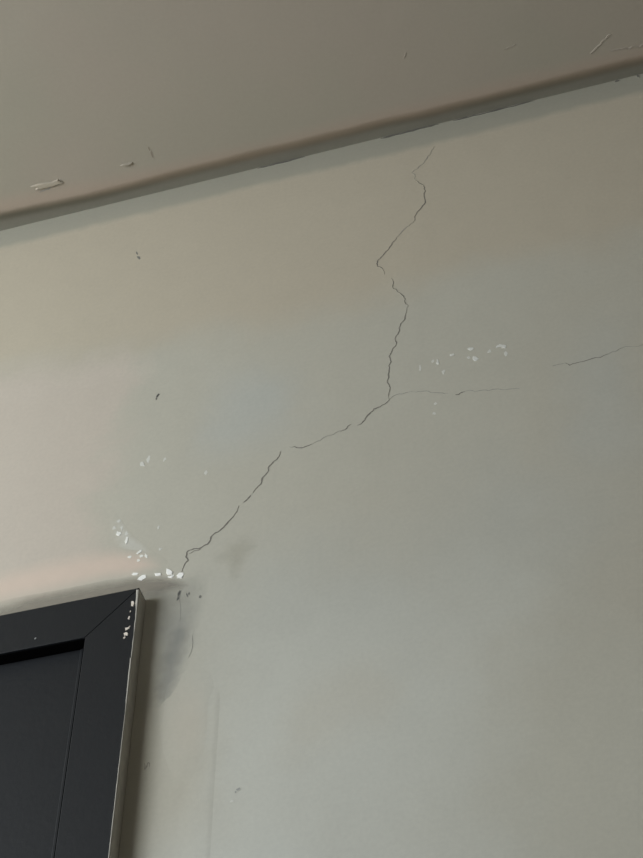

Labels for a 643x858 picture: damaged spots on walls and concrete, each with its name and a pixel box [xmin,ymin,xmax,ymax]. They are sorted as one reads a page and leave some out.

crack [182,100,535,571]
peeling [132,569,184,581]